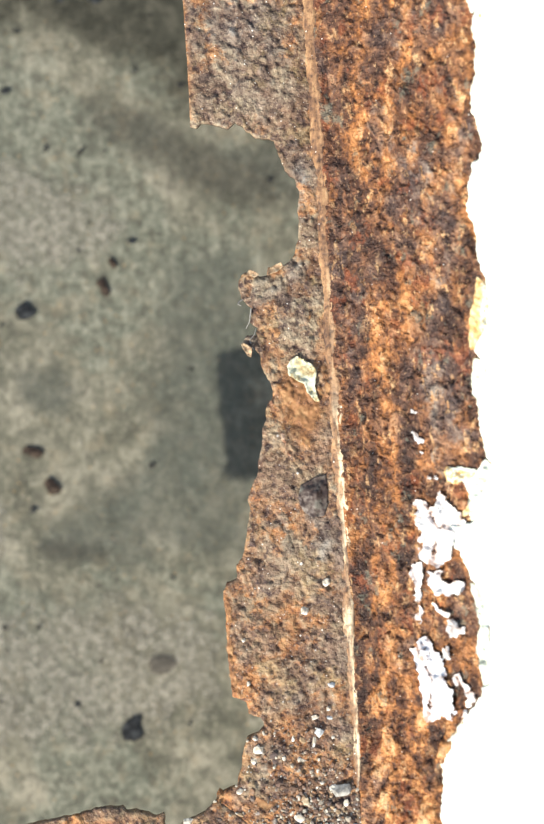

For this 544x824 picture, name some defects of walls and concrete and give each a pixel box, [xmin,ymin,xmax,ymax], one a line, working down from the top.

rust [269,0,492,824]
rust [224,595,241,699]
peeling [409,458,494,723]